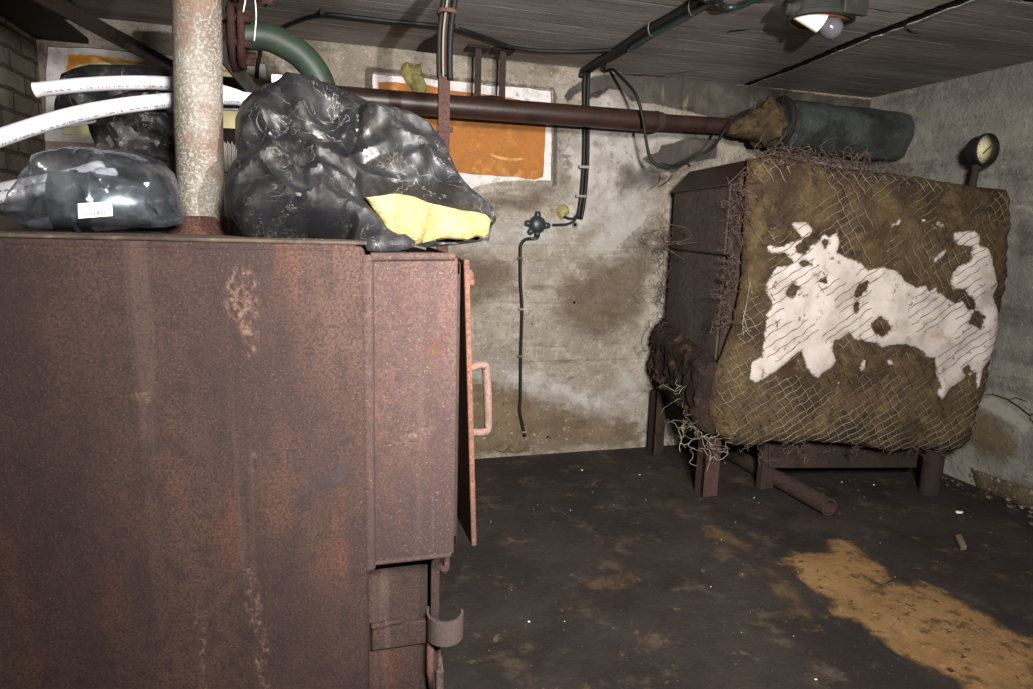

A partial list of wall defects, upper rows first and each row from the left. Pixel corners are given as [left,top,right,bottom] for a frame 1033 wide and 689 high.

crack [744,0,981,85]
leakage [502,369,604,407]
crack [983,394,1031,416]